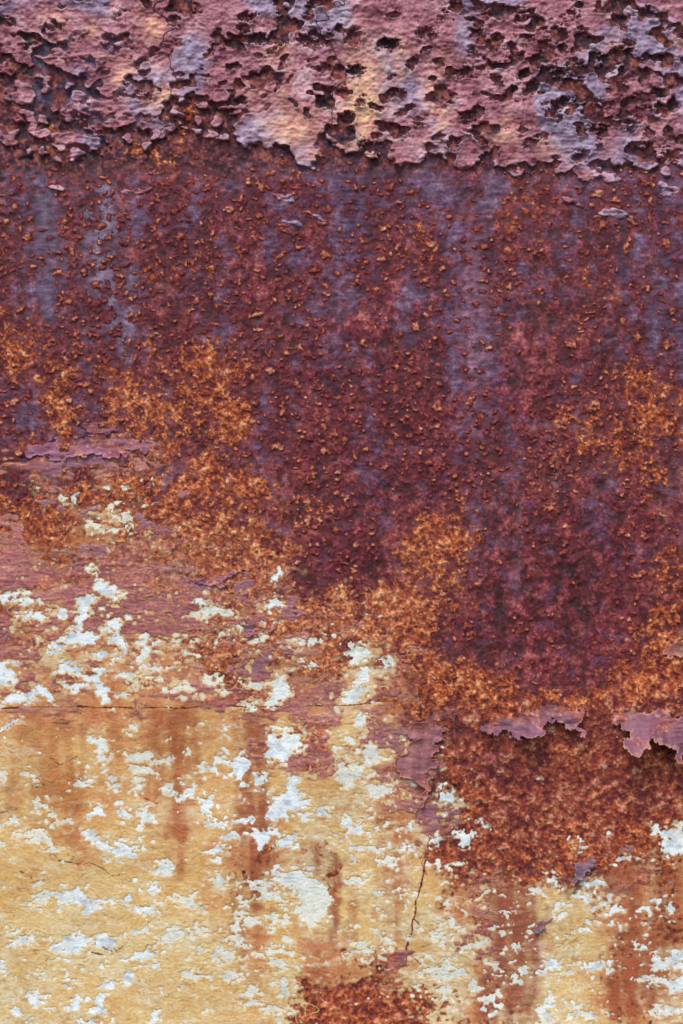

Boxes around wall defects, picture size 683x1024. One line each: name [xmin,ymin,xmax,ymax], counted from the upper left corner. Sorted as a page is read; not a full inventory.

peeling [0,0,683,197]
corrosion [119,99,333,316]
peeling [272,194,295,203]
corrosion [337,161,683,333]
peeling [598,207,633,220]
corrosion [516,328,683,556]
crack [0,705,201,732]
corrosion [231,716,272,910]
peeling [0,422,683,1024]
crack [309,699,399,707]
crack [405,771,448,965]
corrosion [285,950,470,1024]